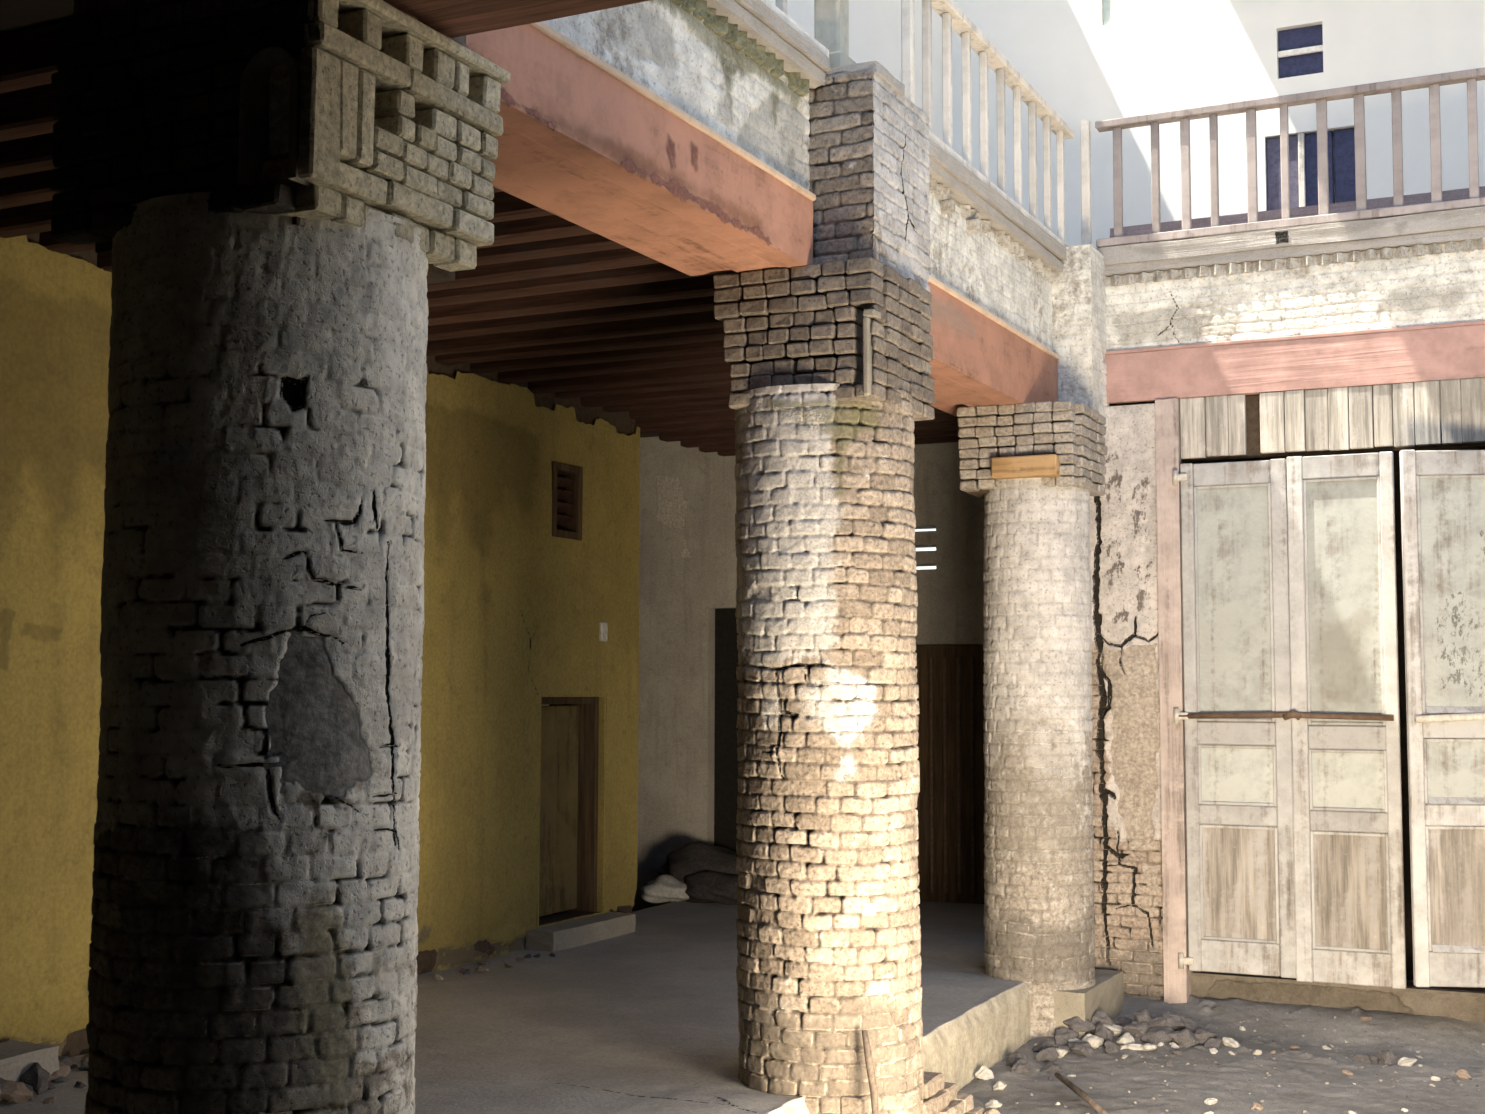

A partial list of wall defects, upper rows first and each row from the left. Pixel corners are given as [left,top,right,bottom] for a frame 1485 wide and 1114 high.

spalling [264,376,308,412]
crack [217,762,281,820]
spalling [263,631,372,797]
crack [240,490,400,851]
crack [1092,496,1158,966]